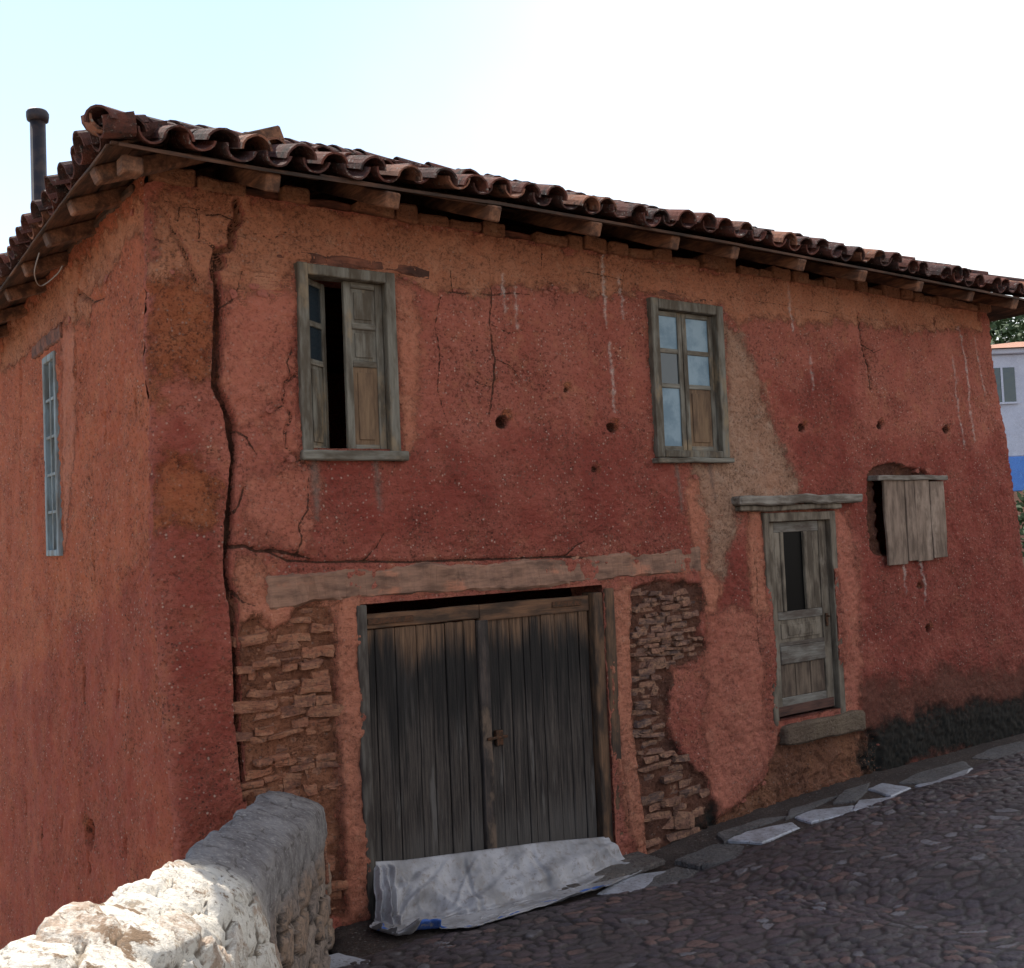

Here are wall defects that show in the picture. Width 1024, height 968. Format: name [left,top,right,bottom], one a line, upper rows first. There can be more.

spalling [230,601,348,917]
crack [165,200,587,782]
peeling [0,184,983,556]
spalling [629,478,883,854]
crack [858,314,957,387]
water stain [856,665,1024,775]